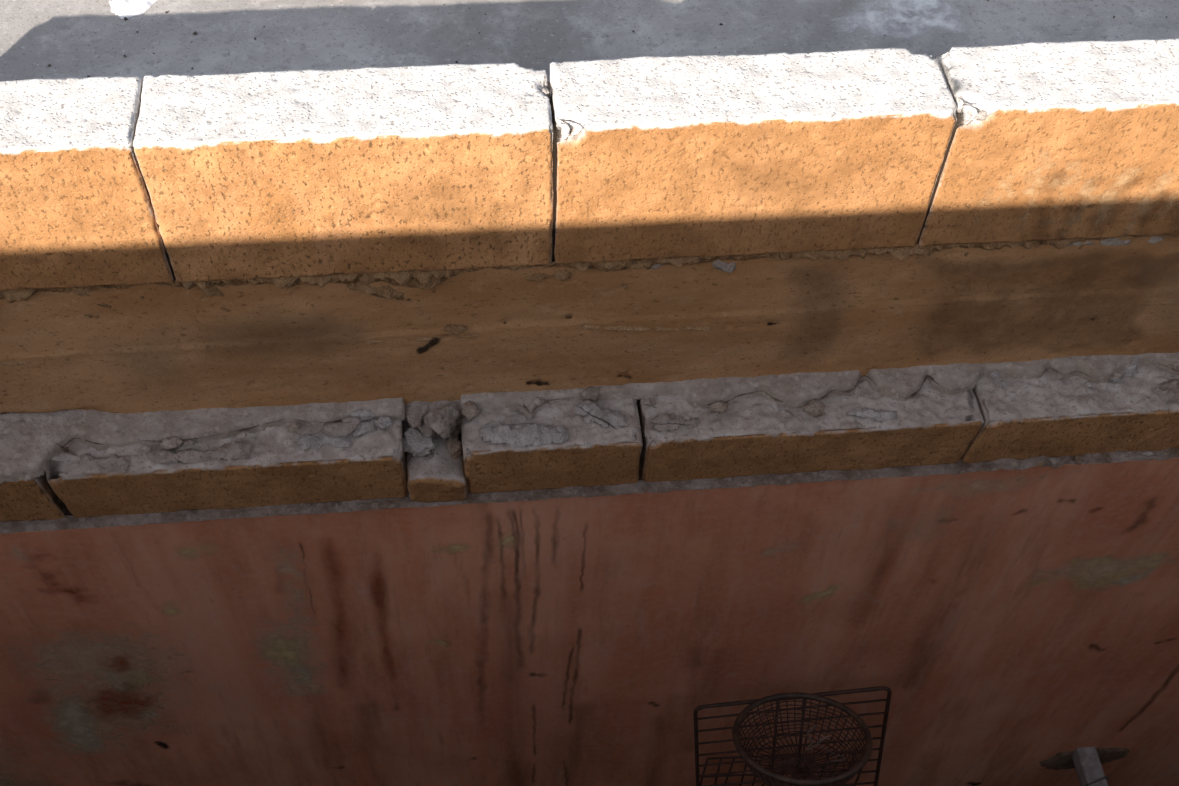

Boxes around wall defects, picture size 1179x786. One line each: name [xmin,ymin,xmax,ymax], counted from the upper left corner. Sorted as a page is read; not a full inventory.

crack [130,147,176,280]
crack [547,81,559,262]
crack [916,59,963,244]
crack [48,438,109,516]
crack [524,399,684,480]